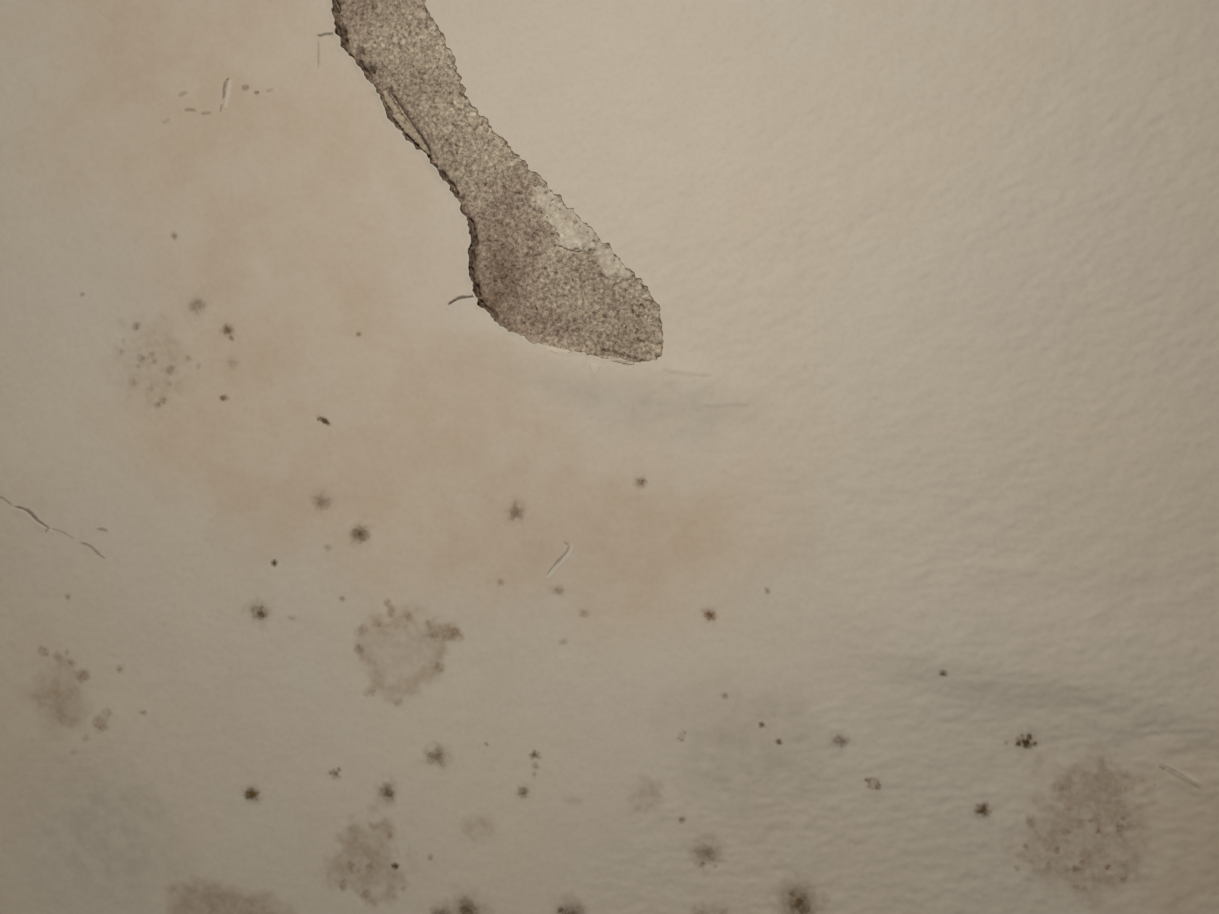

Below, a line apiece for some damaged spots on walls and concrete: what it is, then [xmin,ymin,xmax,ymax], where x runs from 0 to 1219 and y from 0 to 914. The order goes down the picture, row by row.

peeling [325,0,671,374]